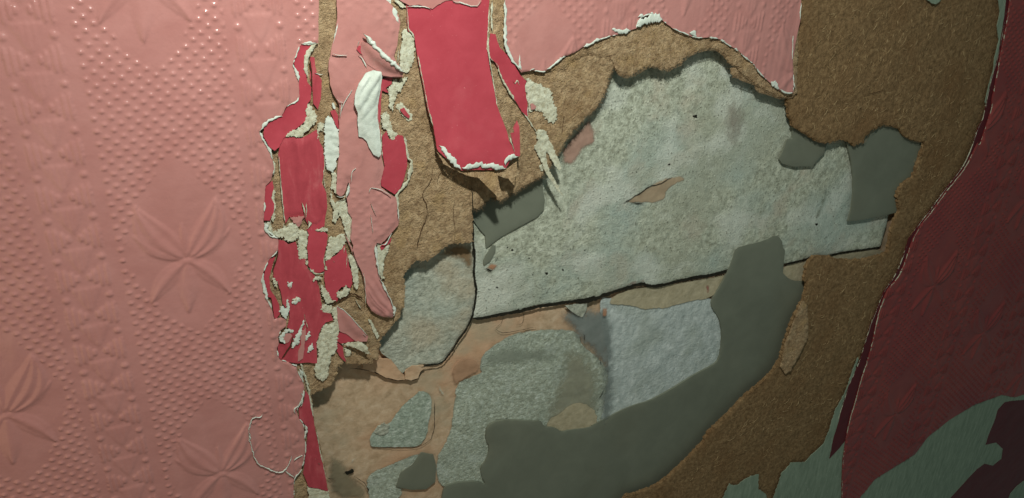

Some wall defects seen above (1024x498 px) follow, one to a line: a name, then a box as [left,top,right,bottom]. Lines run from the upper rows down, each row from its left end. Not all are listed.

peeling [378,77,413,207]
peeling [406,0,545,271]
flaking render [624,164,684,204]
peeling [778,127,827,167]
peeling [846,125,922,221]
peeling [261,43,353,498]
crack [421,186,728,368]
crack [787,247,880,265]
peeling [353,236,806,498]